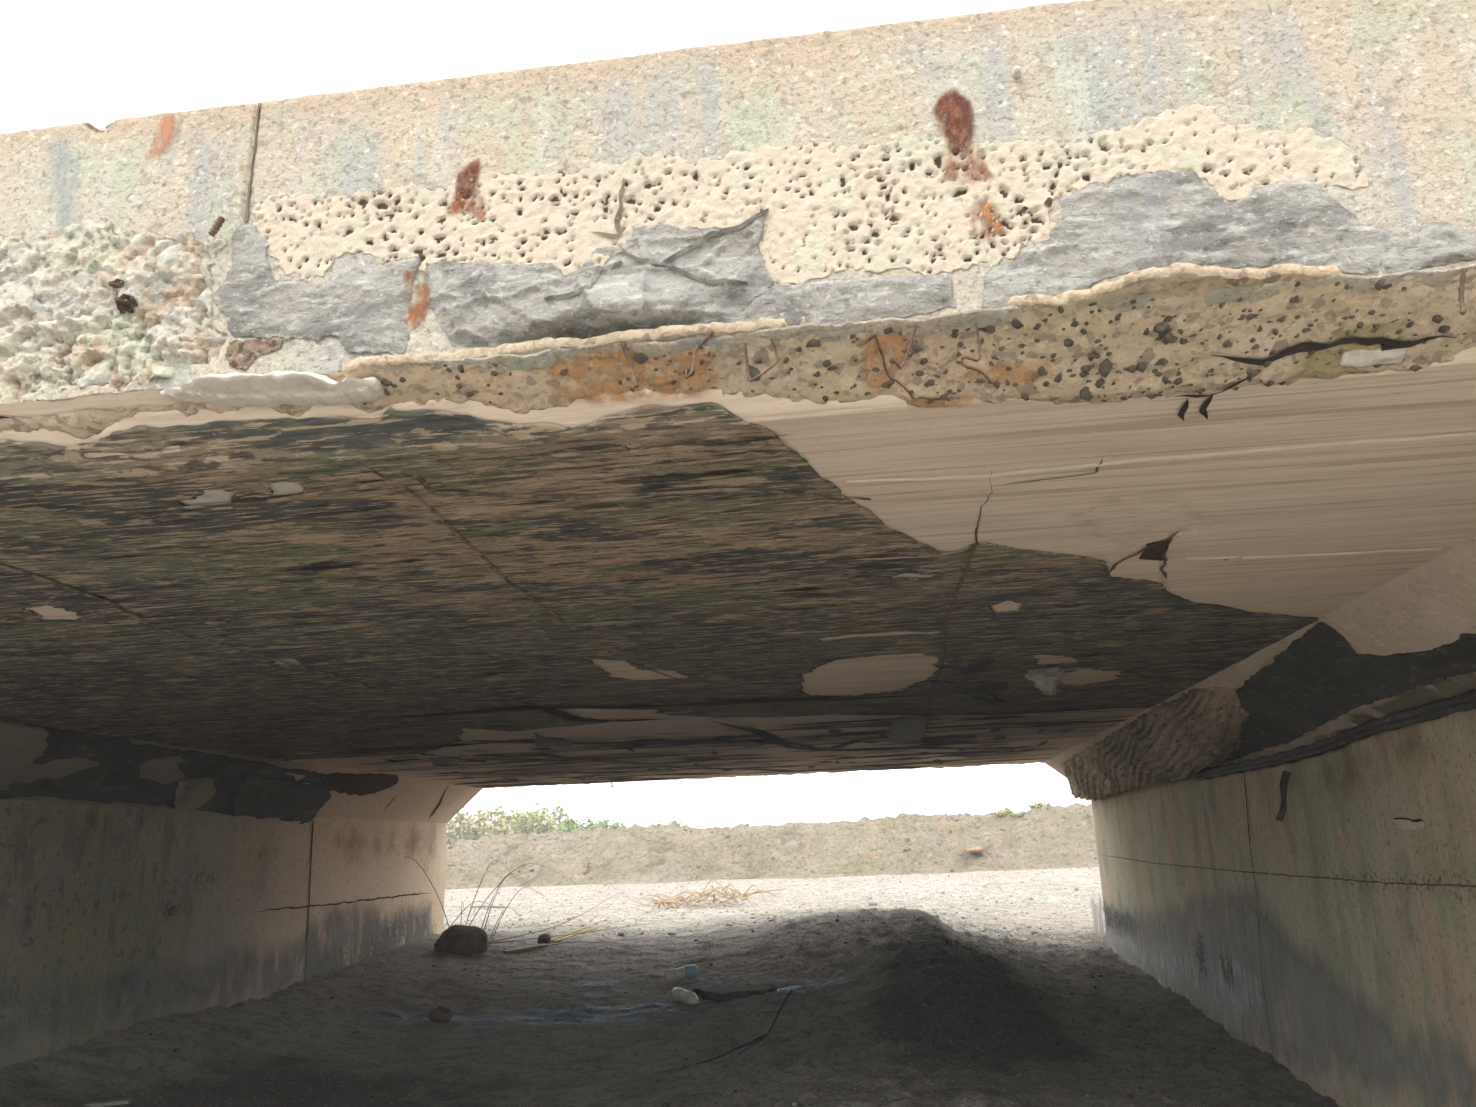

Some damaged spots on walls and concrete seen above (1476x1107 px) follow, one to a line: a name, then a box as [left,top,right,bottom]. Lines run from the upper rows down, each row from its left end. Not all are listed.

crack [243,101,260,223]
rust [448,161,484,219]
rust [935,91,992,181]
rust [405,271,429,326]
spalling [0,219,283,439]
rust [553,349,715,400]
rust [865,331,906,388]
spalling [334,263,1476,414]
spalling [1106,528,1183,579]
peeling [26,605,80,620]
peeling [801,653,939,695]
spalling [315,759,403,796]